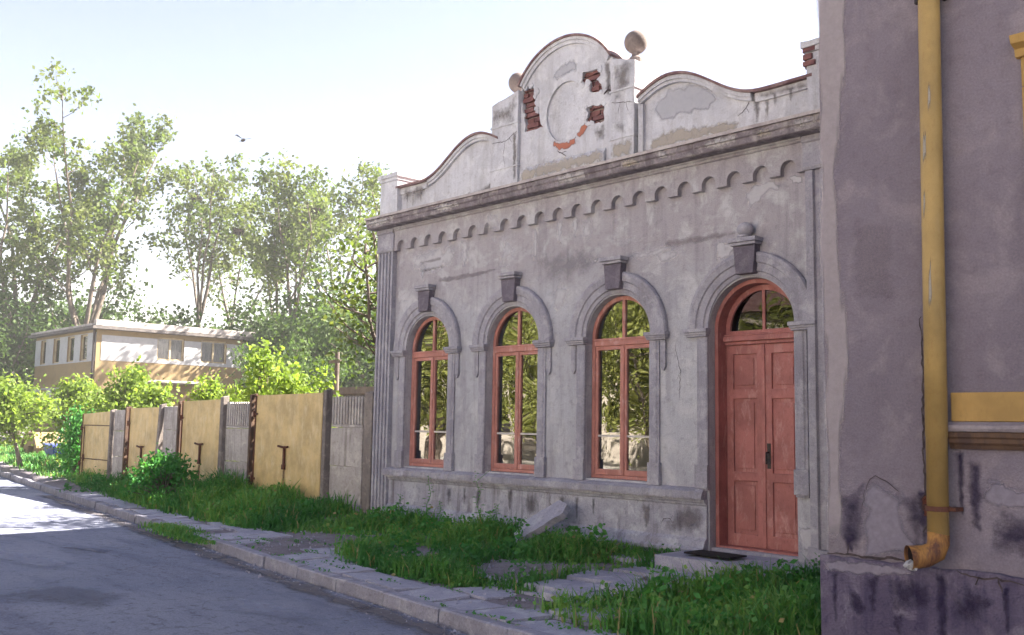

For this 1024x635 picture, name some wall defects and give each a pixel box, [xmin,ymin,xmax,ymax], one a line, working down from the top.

spalling [802,45,816,70]
flaking render [522,83,543,132]
flaking render [553,65,606,150]
crack [862,317,927,532]
water stain [958,455,981,526]
water stain [826,501,982,635]
crack [957,570,1024,593]
water stain [1003,524,1024,543]